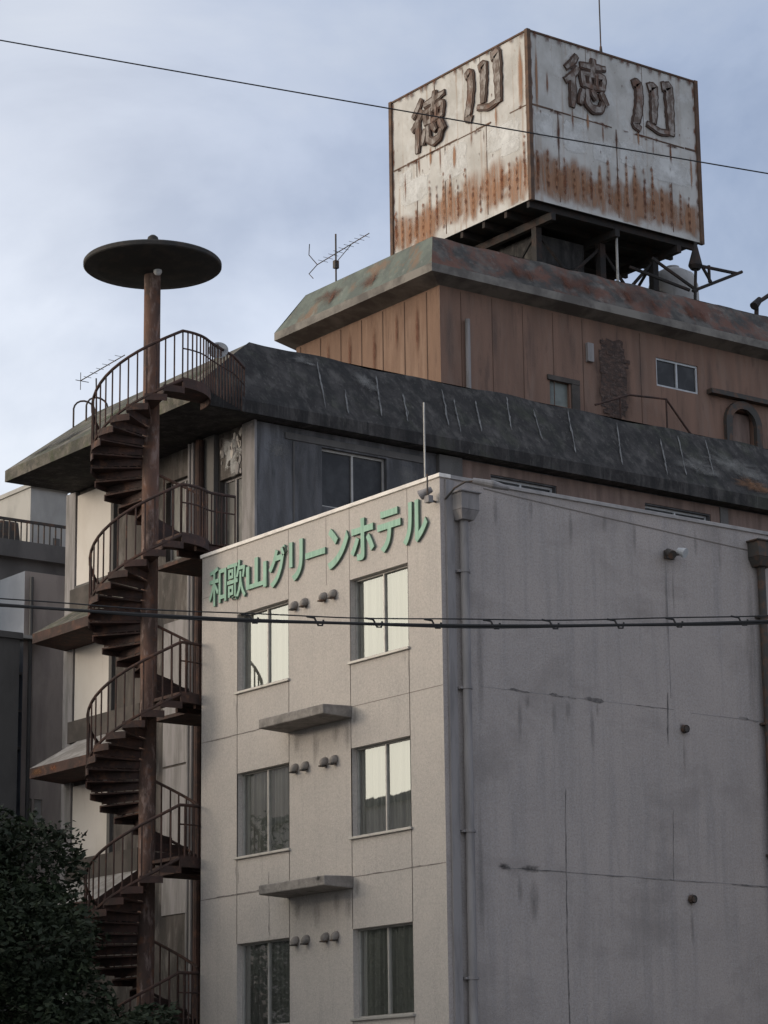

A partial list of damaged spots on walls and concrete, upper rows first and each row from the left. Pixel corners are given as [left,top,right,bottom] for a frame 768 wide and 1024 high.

corrosion [518,54,548,109]
corrosion [551,107,680,169]
corrosion [393,129,699,249]
spalling [599,338,630,418]
peeling [219,427,242,474]